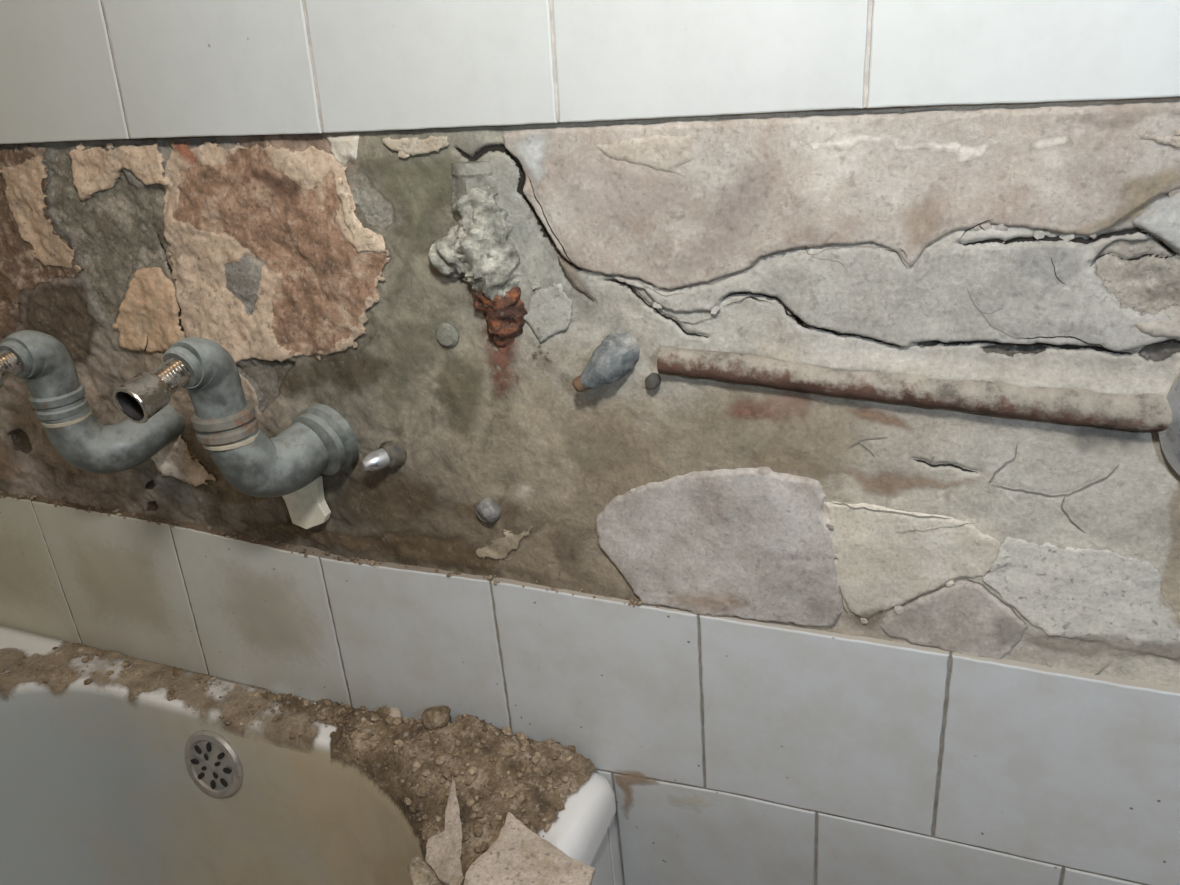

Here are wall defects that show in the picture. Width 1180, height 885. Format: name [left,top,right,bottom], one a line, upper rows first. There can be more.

flaking render [382,135,449,158]
flaking render [0,134,394,412]
crack [456,145,1180,355]
flaking render [503,100,1180,362]
corrosion [472,286,528,392]
flaking render [151,435,217,487]
corrosion [733,393,806,417]
corrosion [855,409,906,427]
crack [913,443,1120,533]
flaking render [475,526,533,560]
flaking render [596,467,1180,660]